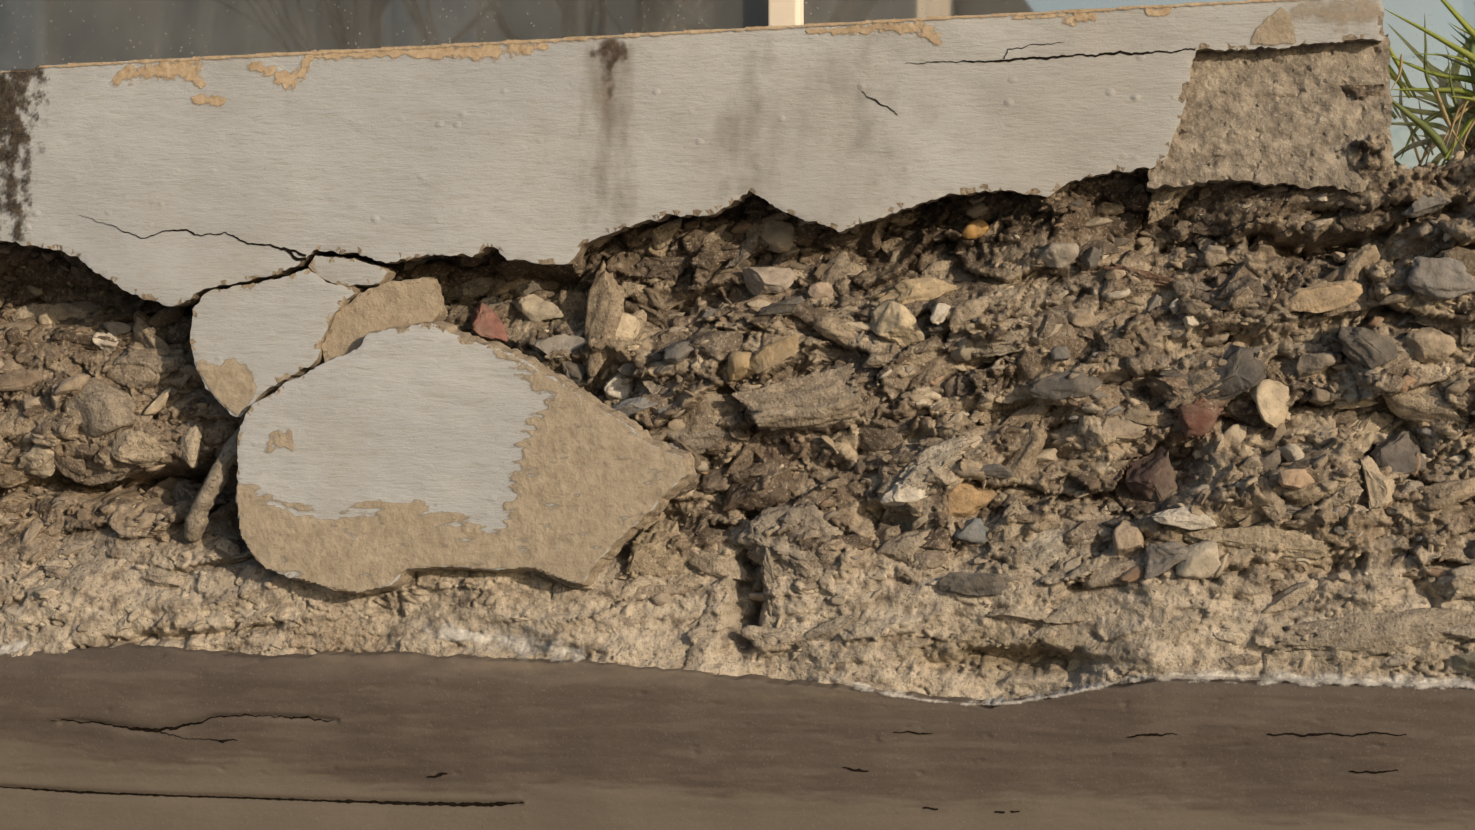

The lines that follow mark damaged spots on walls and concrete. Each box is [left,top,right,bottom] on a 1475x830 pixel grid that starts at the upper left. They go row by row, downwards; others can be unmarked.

peeling [34,0,1384,106]
crack [79,215,306,261]
spalling [0,133,1475,700]